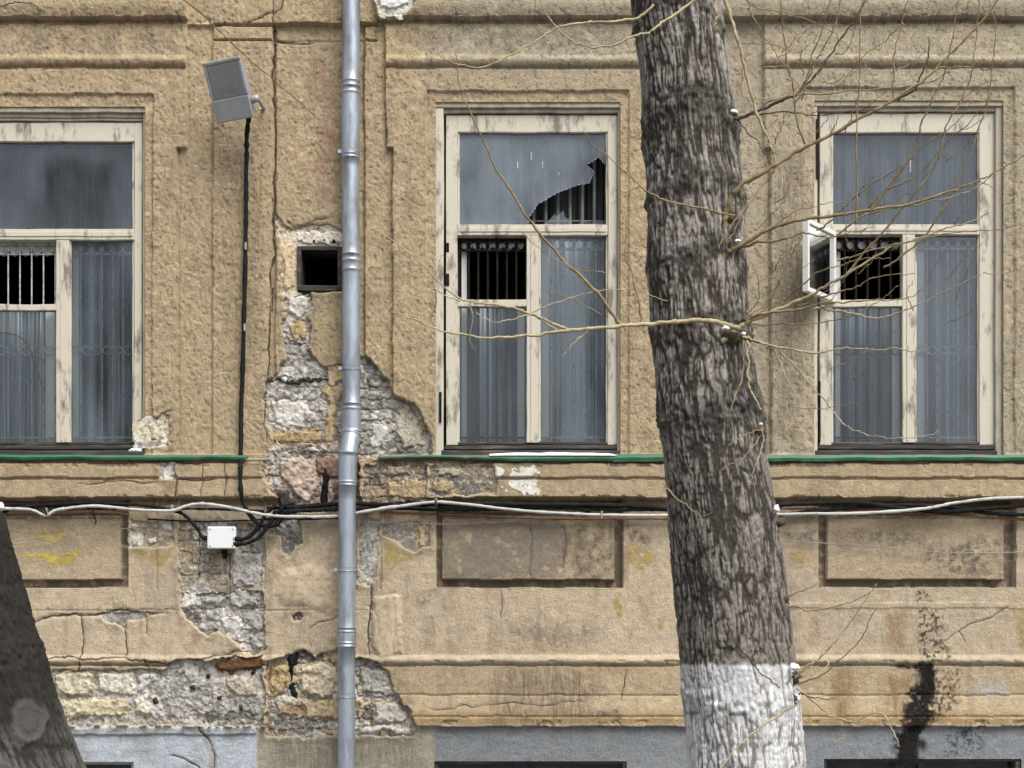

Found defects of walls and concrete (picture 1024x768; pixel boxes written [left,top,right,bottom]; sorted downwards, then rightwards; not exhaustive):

spalling [374,0,415,20]
crack [246,0,326,440]
spalling [51,216,343,738]
spalling [356,354,540,586]
crack [36,608,245,670]
spalling [355,658,417,736]
leakage [848,591,958,768]